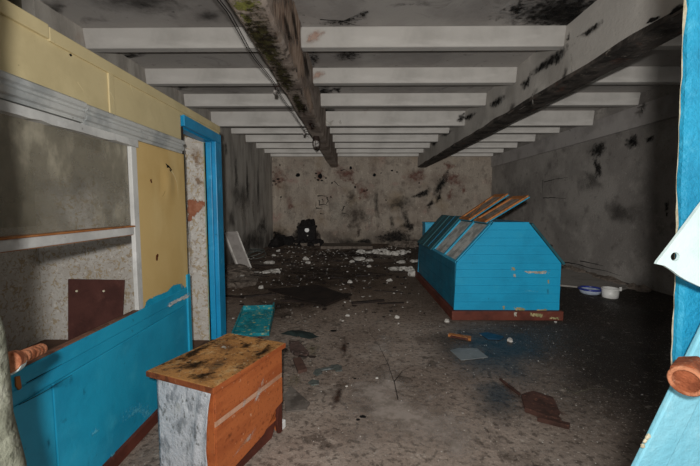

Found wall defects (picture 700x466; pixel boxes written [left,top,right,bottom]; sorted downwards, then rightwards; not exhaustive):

water stain [503,0,597,40]
water stain [274,0,321,113]
water stain [523,50,564,89]
water stain [592,143,605,177]
water stain [416,170,448,208]
water stain [378,216,413,243]